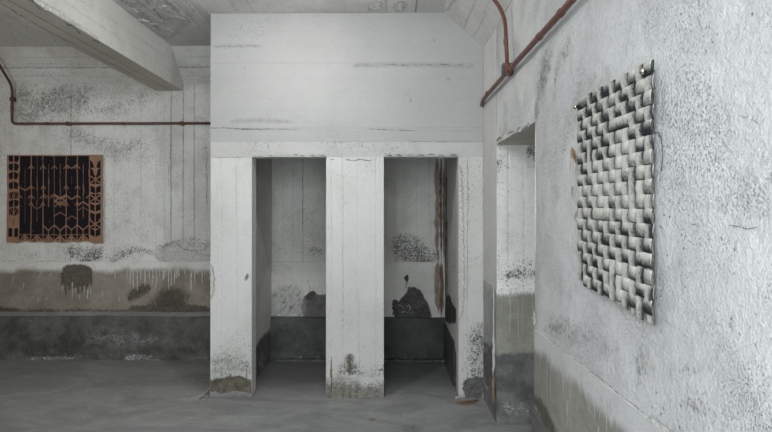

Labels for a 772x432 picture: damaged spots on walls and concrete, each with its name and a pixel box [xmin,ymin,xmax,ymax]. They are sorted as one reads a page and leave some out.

rust [435,159,448,316]
water stain [0,244,210,312]
water stain [301,291,326,317]
water stain [391,287,432,317]
water stain [445,296,456,324]
water stain [191,356,251,401]
water stain [462,322,495,398]
water stain [503,397,554,432]